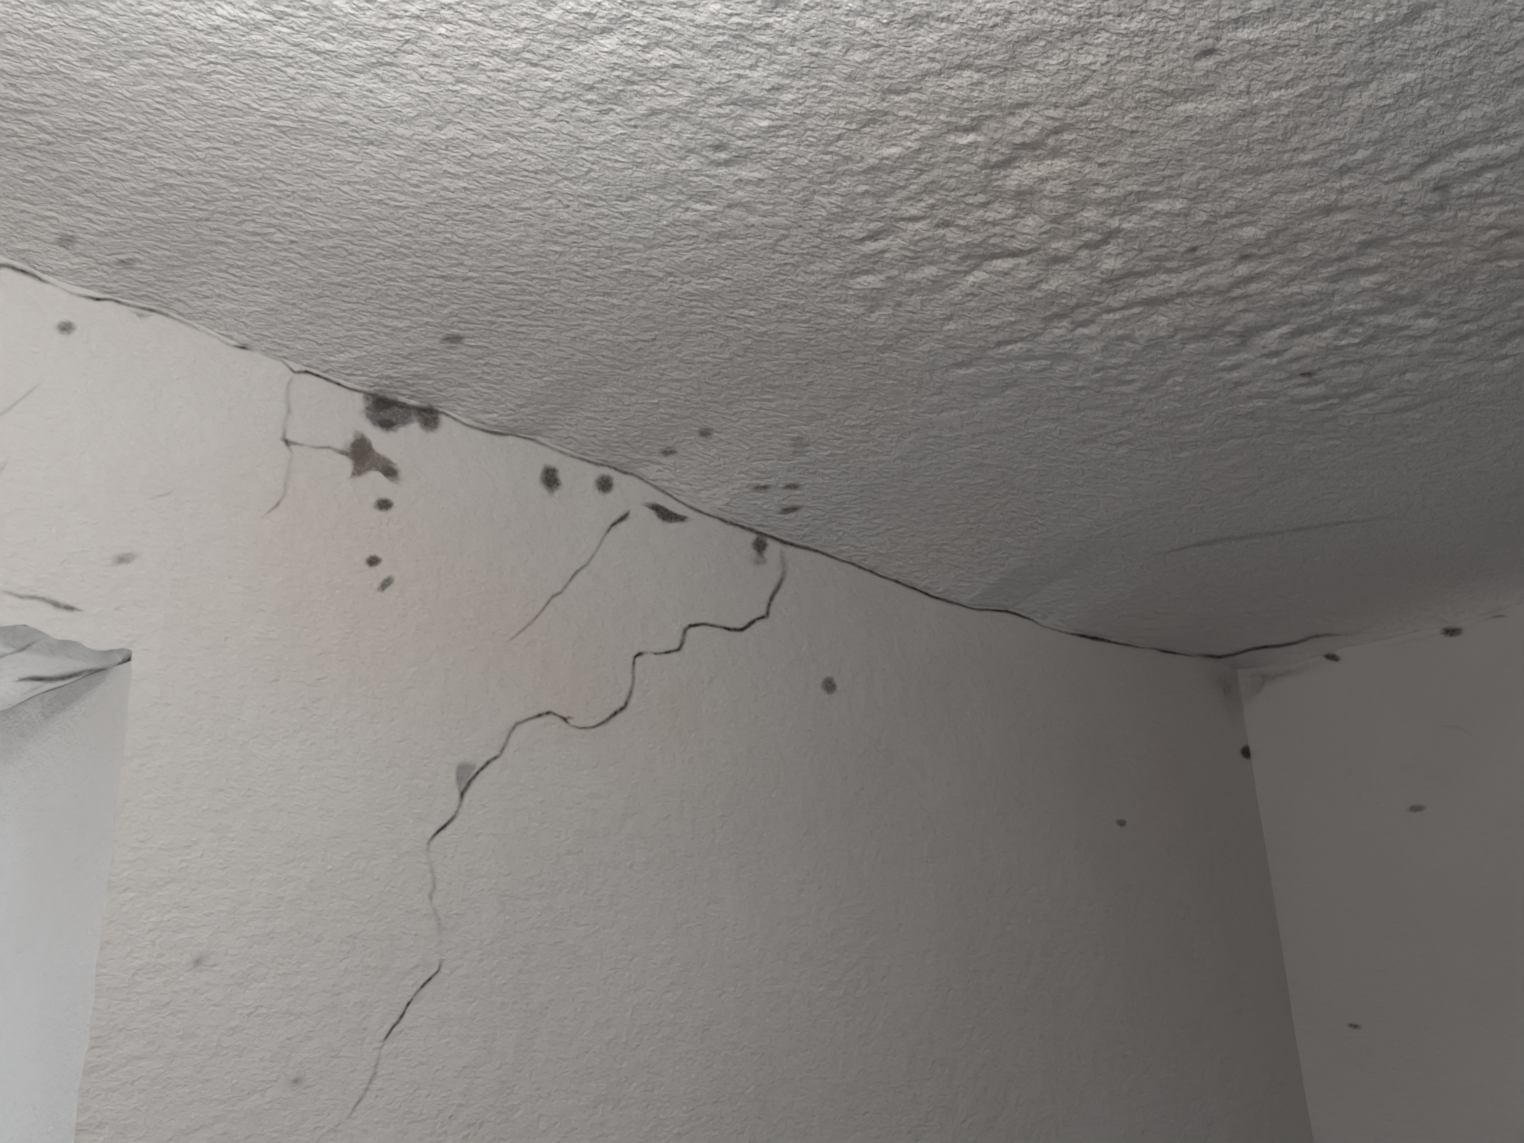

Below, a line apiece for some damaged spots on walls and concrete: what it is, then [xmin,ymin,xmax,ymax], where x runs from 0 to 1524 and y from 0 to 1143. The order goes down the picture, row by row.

crack [0,265,41,280]
crack [88,296,155,312]
crack [291,369,532,440]
crack [587,460,1033,621]
crack [22,669,99,682]
crack [535,583,781,728]
crack [1071,633,1319,658]
crack [432,756,498,837]
crack [386,971,438,1038]